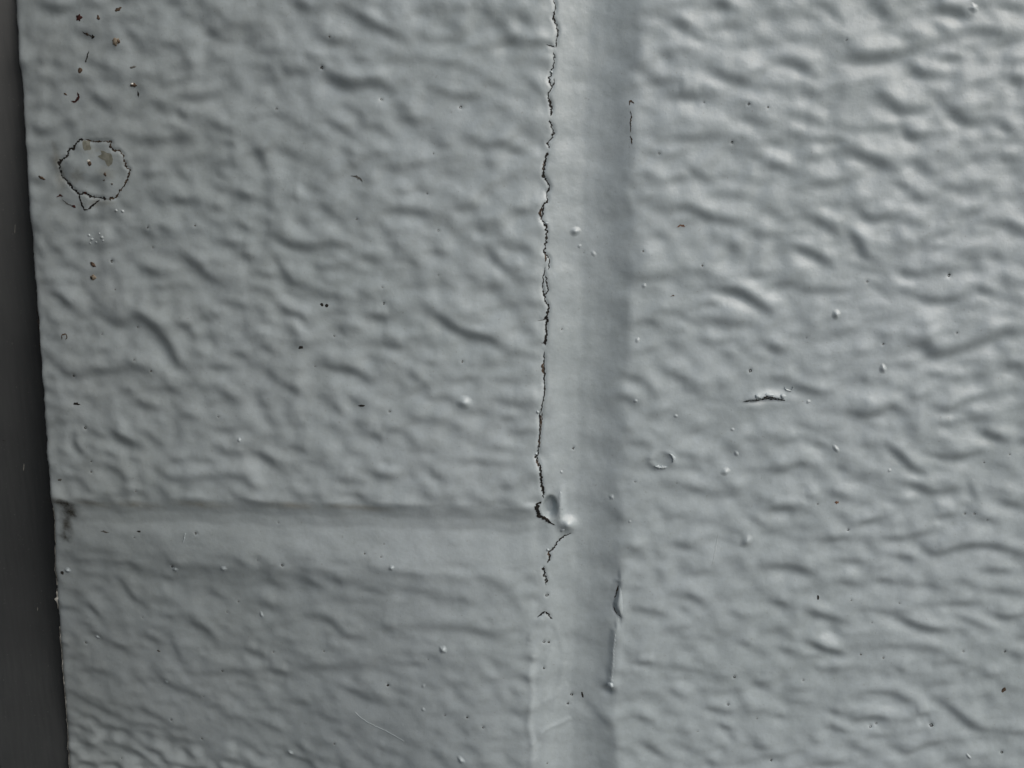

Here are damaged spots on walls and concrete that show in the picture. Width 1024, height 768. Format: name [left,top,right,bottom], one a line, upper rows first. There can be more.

crack [57,138,131,211]
crack [534,0,559,498]
crack [542,533,571,583]